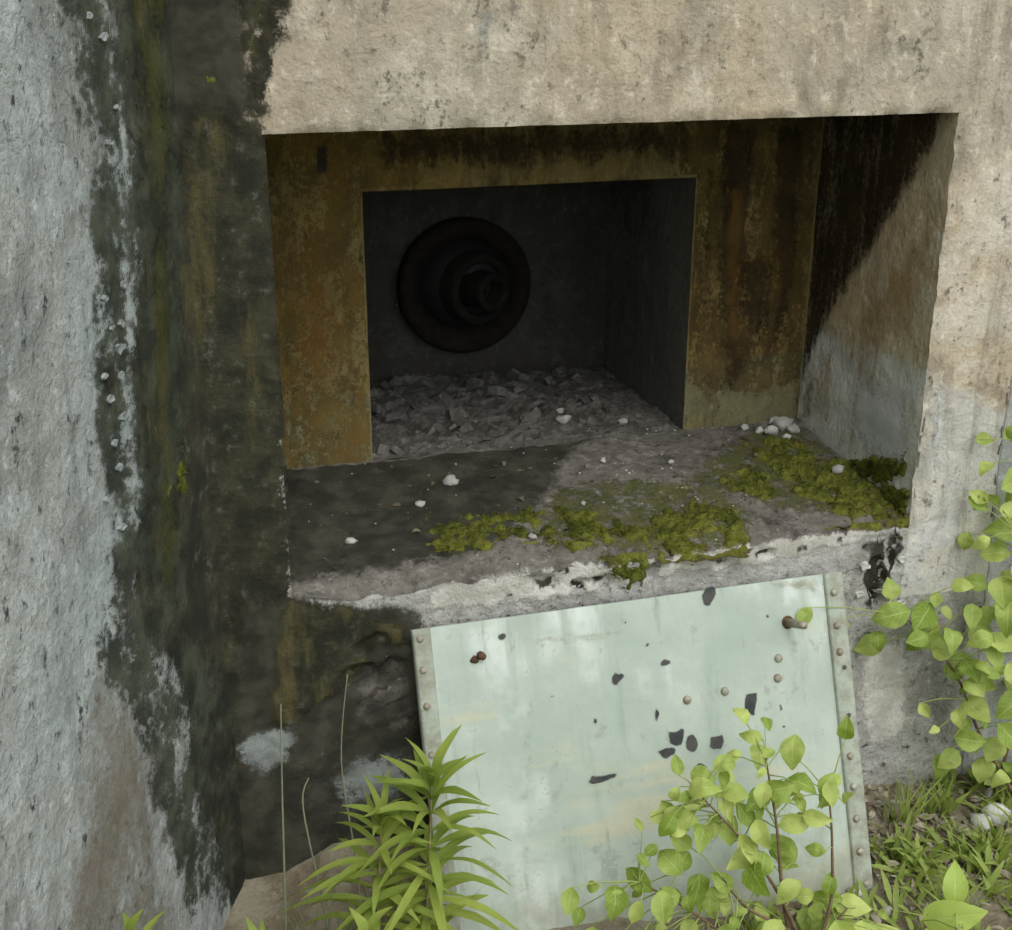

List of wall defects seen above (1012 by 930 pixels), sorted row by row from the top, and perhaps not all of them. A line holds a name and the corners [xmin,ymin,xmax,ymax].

water stain [53,0,592,930]
water stain [854,385,909,461]
crack [991,393,1009,517]
spalling [429,526,907,612]